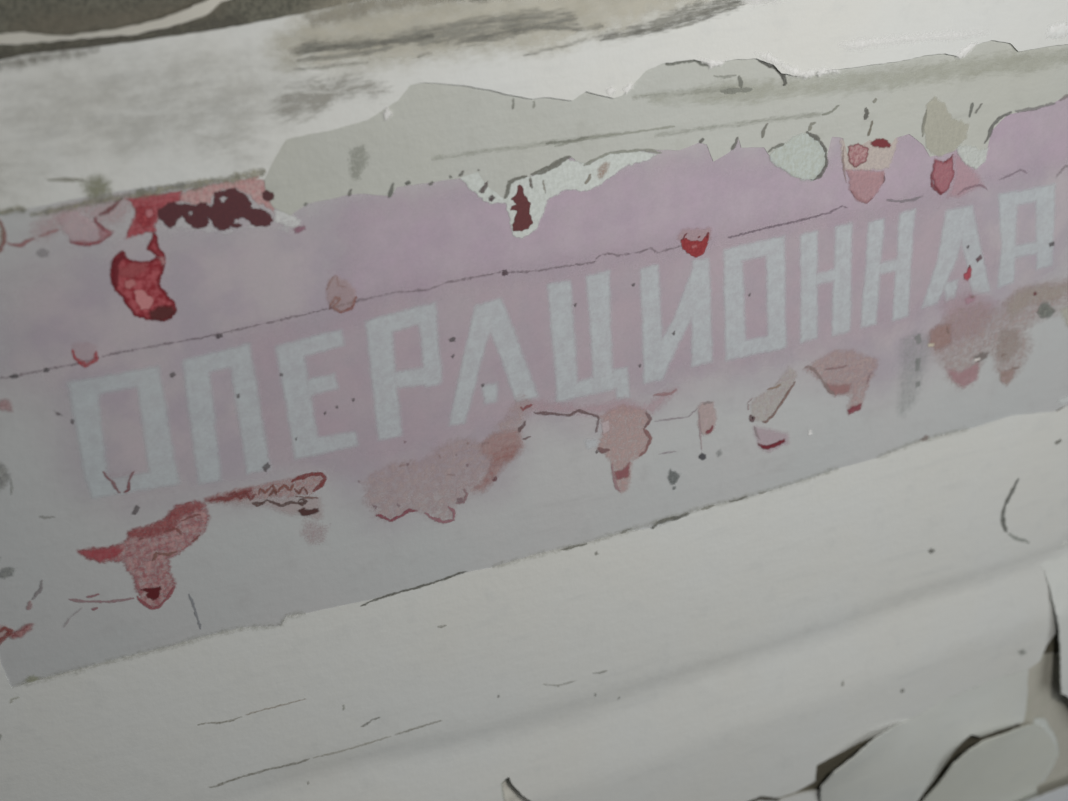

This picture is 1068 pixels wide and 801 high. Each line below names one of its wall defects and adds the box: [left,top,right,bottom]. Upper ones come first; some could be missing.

flaking render [0,0,435,65]
peeling [110,40,1068,321]
peeling [359,400,652,523]
peeling [695,401,721,460]
peeling [748,370,795,450]
peeling [805,350,878,414]
crack [1001,478,1030,543]
peeling [820,541,1068,801]